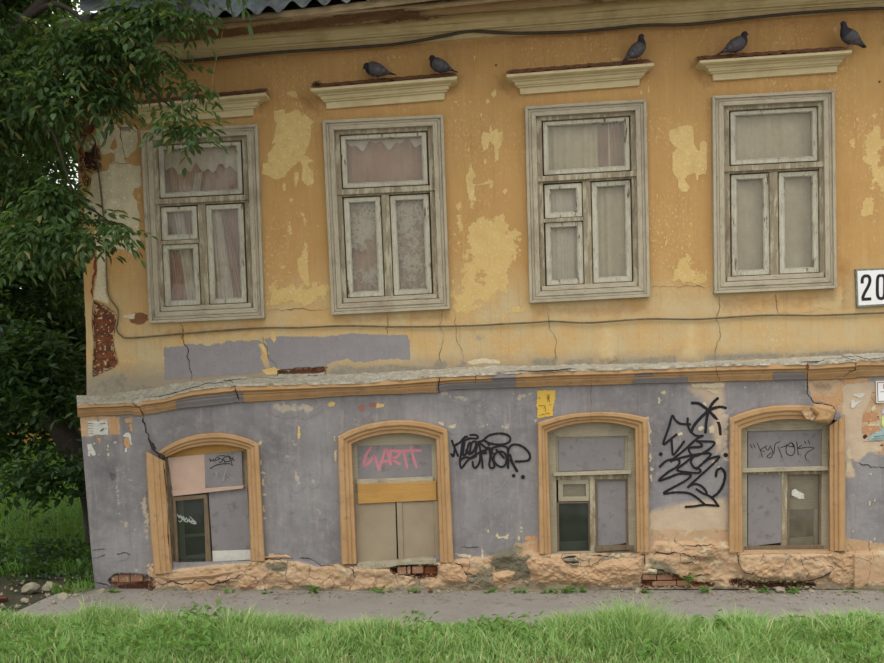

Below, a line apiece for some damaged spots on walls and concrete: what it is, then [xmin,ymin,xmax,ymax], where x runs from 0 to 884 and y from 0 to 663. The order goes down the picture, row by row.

peeling [262,90,314,202]
peeling [480,89,503,164]
peeling [668,125,707,192]
peeling [849,113,884,217]
peeling [72,97,142,377]
peeling [265,241,330,311]
peeling [450,164,522,314]
peeling [93,416,133,457]
crack [132,324,355,585]
peeling [862,405,881,439]
spalling [389,564,439,580]
spalling [641,573,713,588]